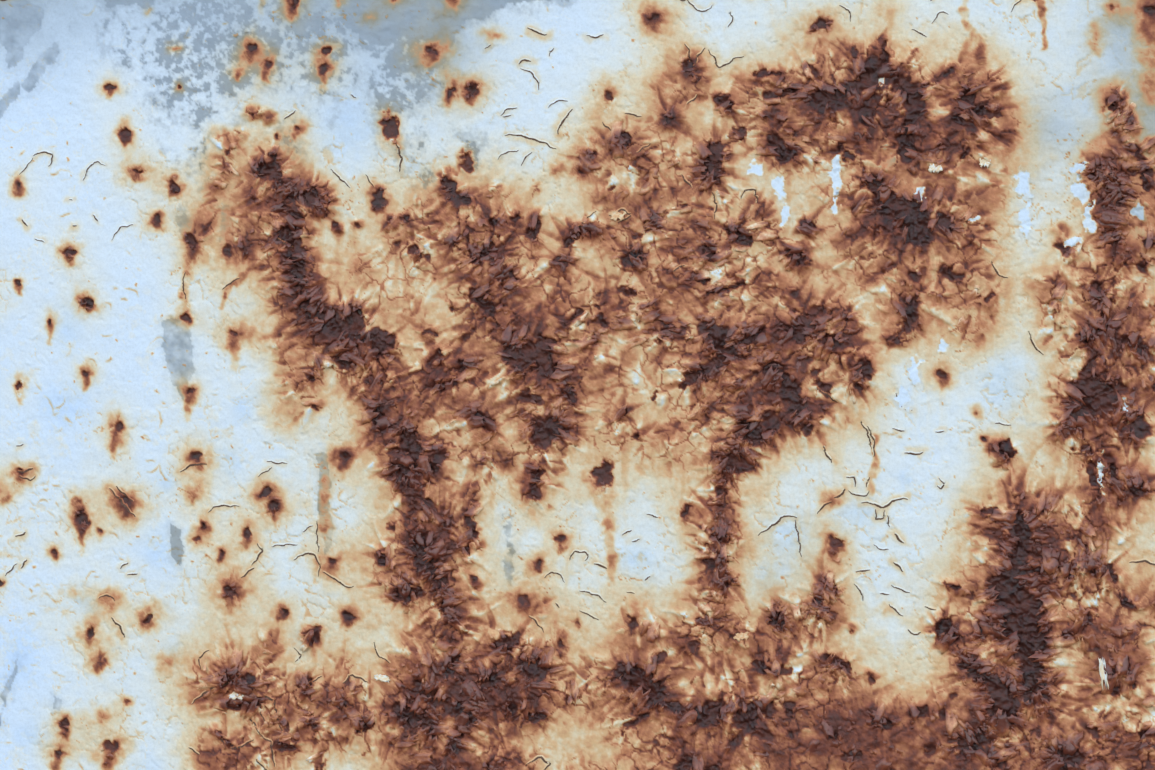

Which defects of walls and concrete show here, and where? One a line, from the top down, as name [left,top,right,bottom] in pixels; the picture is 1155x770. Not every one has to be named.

rust [97,77,130,101]
rust [226,31,292,90]
rust [268,0,311,28]
peeling [0,0,584,180]
rust [285,0,407,95]
rust [403,0,498,115]
rust [7,152,53,232]
rust [43,197,139,320]
rust [30,308,59,358]
rust [11,352,151,469]
rust [158,377,218,428]
rust [0,459,164,608]